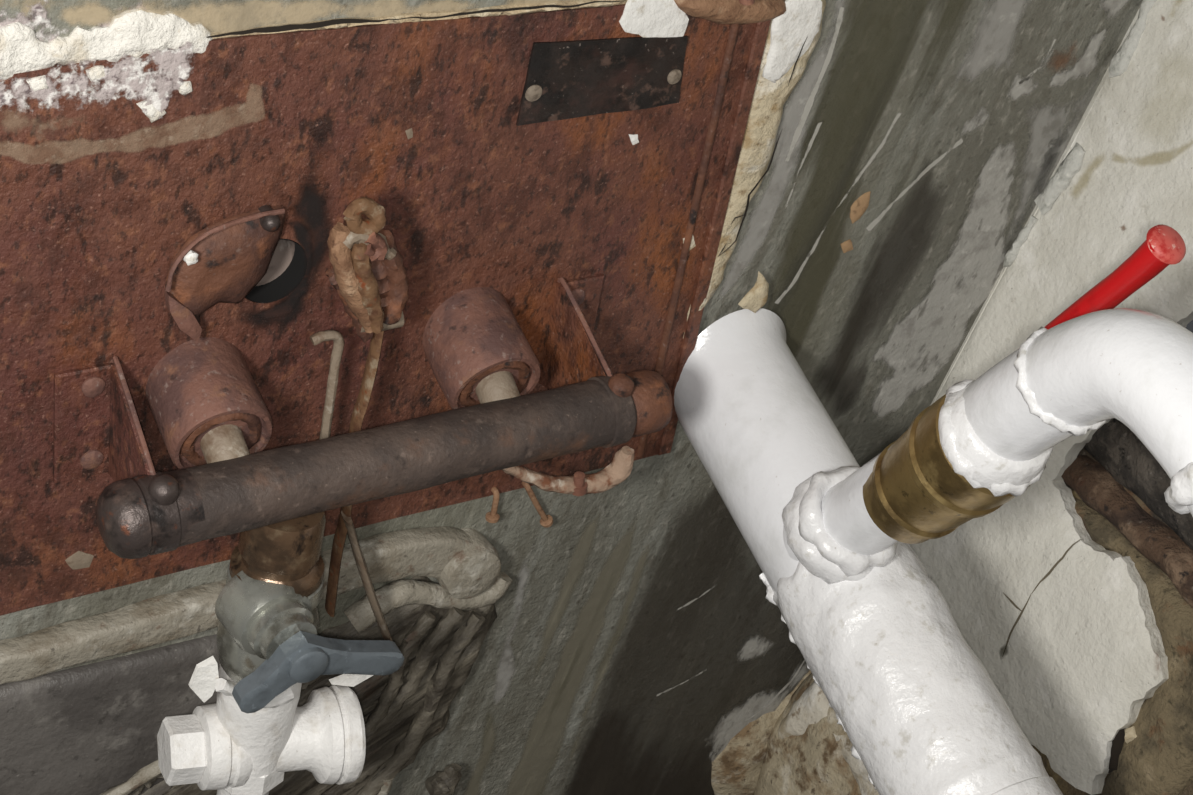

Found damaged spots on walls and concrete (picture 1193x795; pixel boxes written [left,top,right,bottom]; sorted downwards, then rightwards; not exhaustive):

spalling [740,637,771,659]
crack [1000,539,1081,657]
spalling [1032,418,1193,795]
spalling [710,660,879,795]